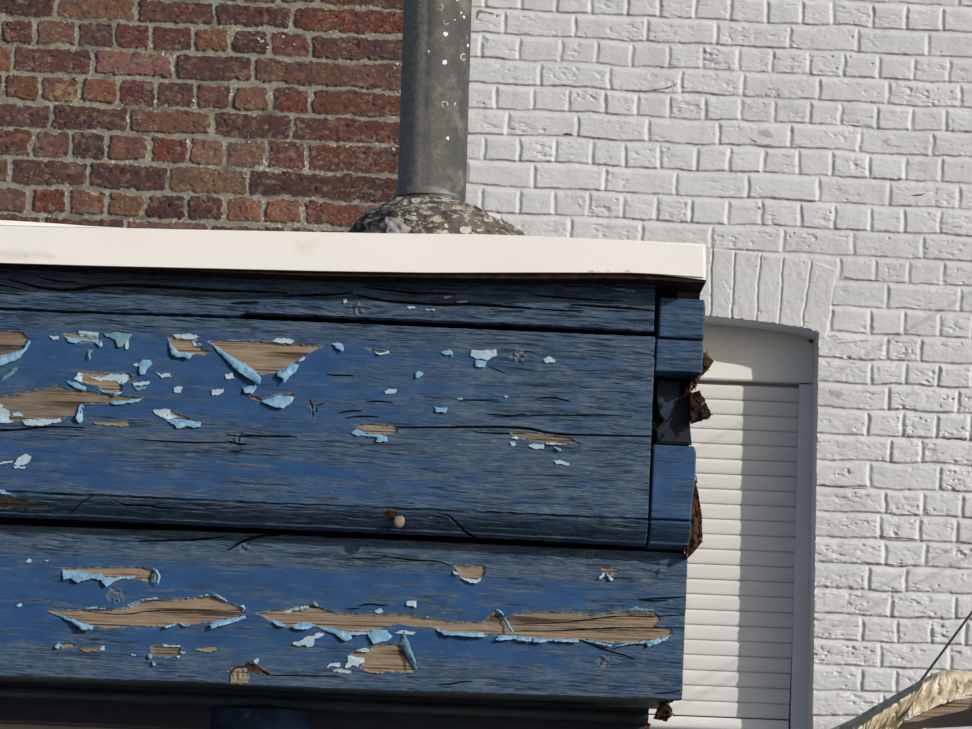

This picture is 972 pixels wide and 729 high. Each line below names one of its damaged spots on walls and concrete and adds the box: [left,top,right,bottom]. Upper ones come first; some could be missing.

peeling [0,330,31,382]
peeling [50,330,132,360]
peeling [169,333,344,408]
spalling [471,349,497,367]
peeling [0,360,183,427]
spalling [153,409,201,428]
peeling [351,423,398,442]
spalling [0,454,31,469]
peeling [509,431,581,466]
peeling [62,566,161,587]
peeling [48,593,672,674]
peeling [229,658,270,685]